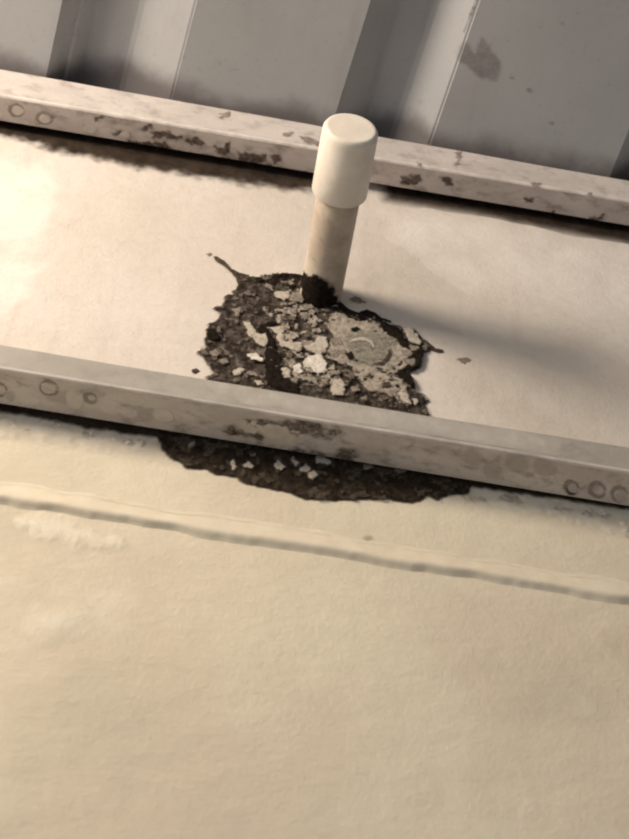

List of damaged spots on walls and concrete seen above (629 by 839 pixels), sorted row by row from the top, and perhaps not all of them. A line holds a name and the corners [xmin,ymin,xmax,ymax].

leakage [0,104,314,326]
spalling [192,253,443,416]